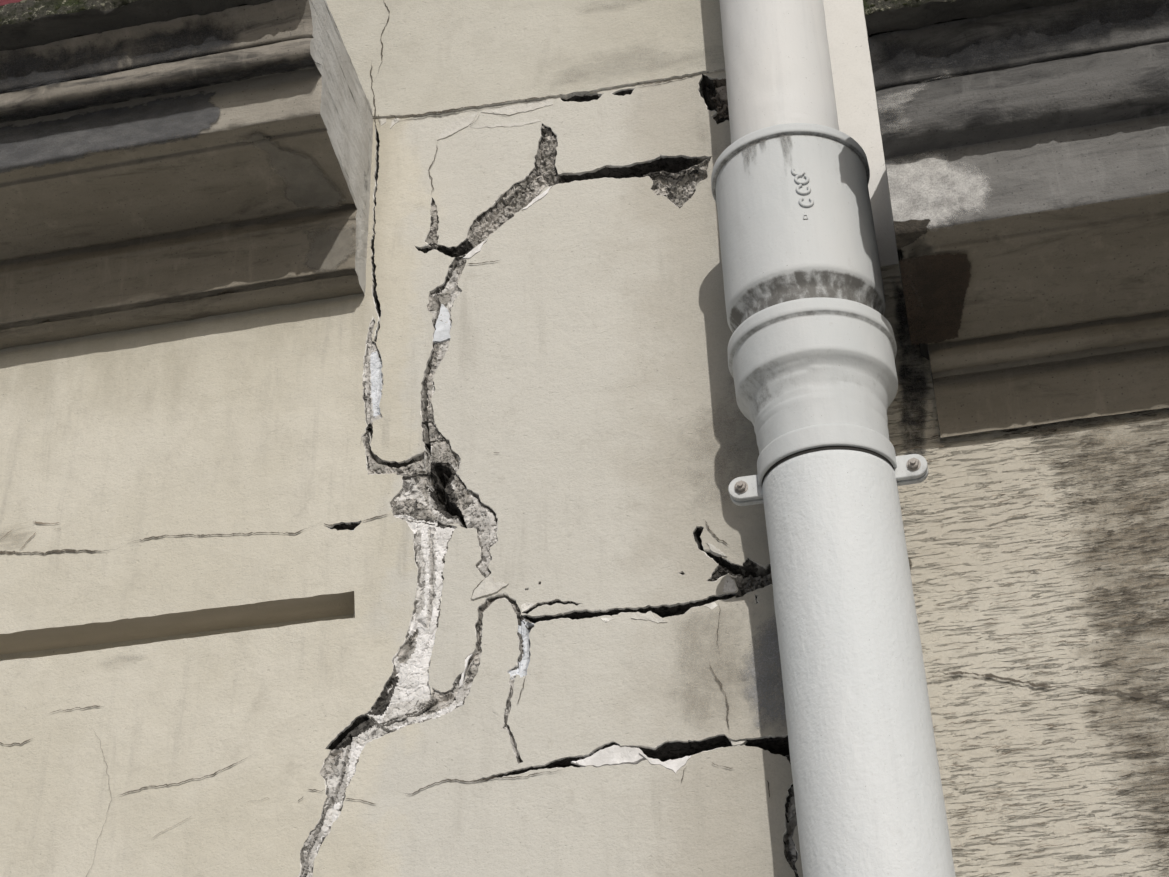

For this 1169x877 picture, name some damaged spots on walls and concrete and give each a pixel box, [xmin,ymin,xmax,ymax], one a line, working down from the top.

crack [0,548,109,556]
crack [121,3,790,877]
water stain [1003,408,1169,875]